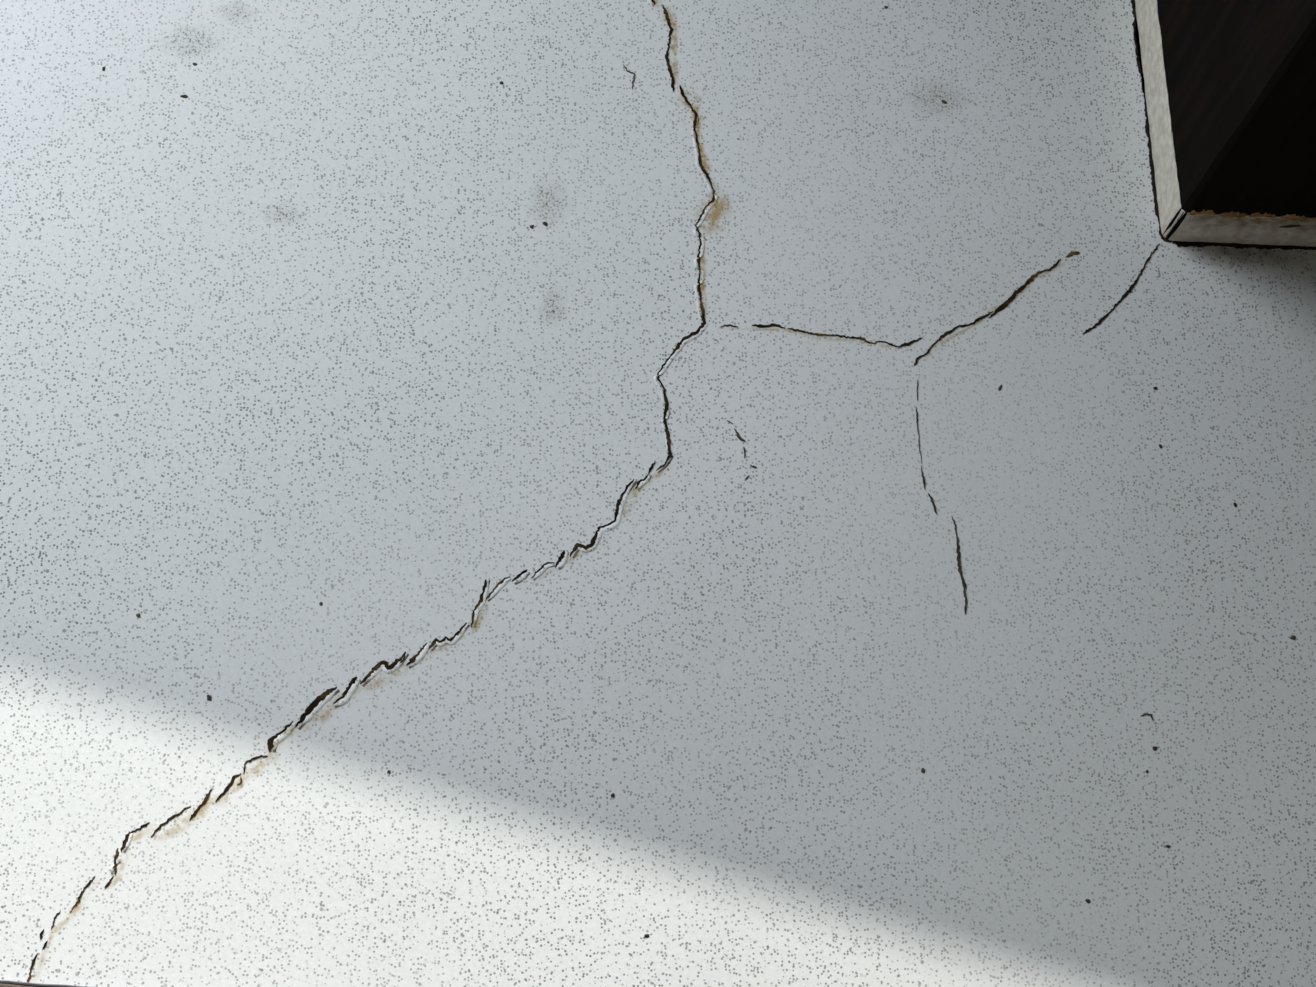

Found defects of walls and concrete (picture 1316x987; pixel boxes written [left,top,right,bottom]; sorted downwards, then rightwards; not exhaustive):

crack [27,0,1080,982]
crack [1083,0,1316,334]